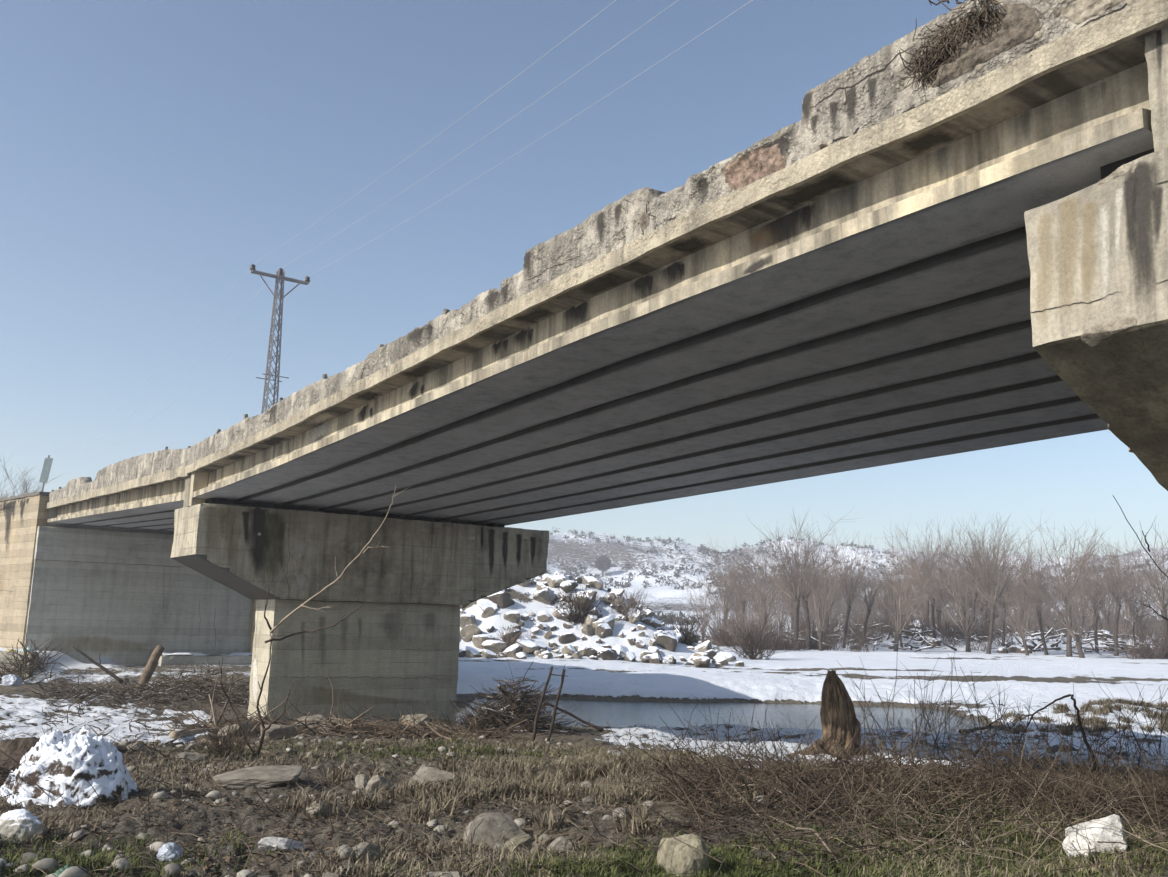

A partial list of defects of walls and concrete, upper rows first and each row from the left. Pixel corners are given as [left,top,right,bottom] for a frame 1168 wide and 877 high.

spalling [637,209,651,234]
water stain [1102,163,1162,283]
water stain [0,498,29,544]
water stain [242,508,284,573]
water stain [481,526,536,571]